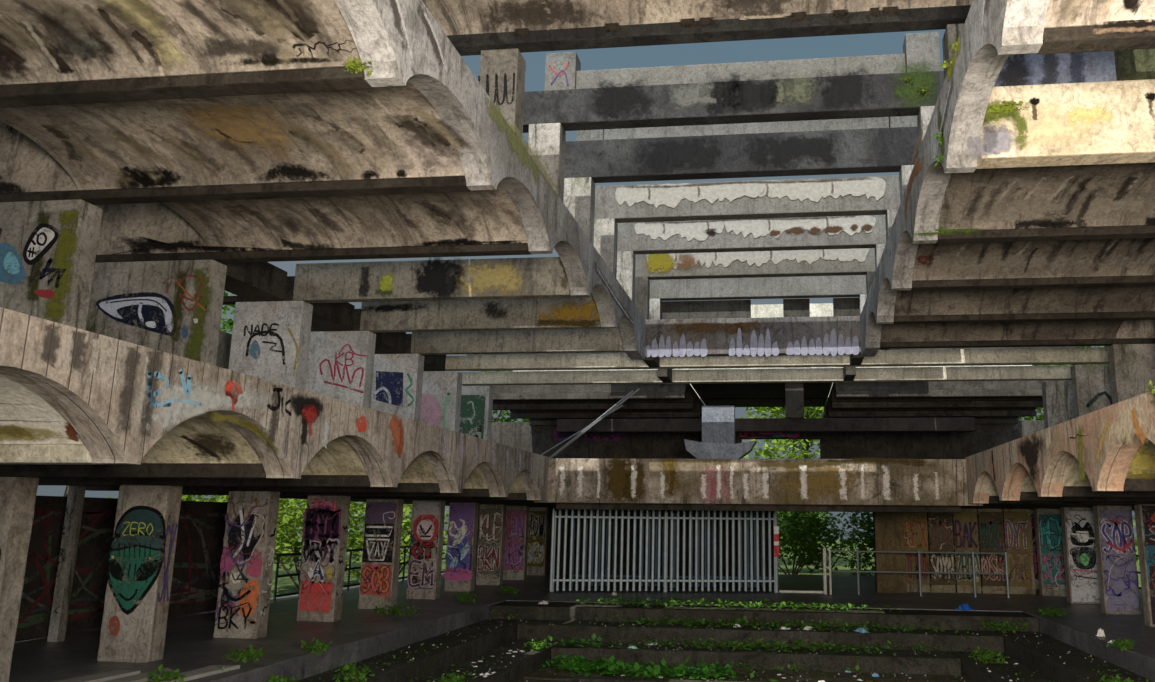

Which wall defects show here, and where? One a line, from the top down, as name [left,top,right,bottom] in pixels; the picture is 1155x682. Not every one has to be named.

water stain [0,0,183,78]
water stain [189,0,318,59]
water stain [486,0,596,30]
water stain [716,0,788,20]
water stain [593,80,651,118]
water stain [673,73,784,115]
water stain [186,106,329,182]
water stain [120,167,181,189]
peeling [615,177,886,208]
peeling [634,215,876,269]
rust [645,216,873,236]
water stain [701,457,939,500]